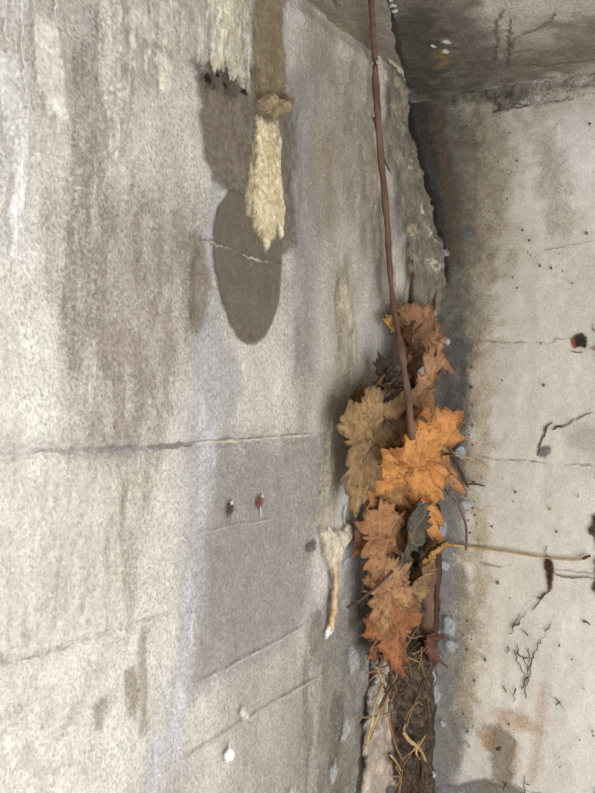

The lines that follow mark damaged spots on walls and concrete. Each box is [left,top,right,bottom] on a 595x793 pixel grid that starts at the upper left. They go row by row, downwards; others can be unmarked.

crack [493,9,557,69]
spalling [374,59,446,316]
crack [27,434,312,455]
leakage [0,0,369,793]
leakage [389,0,595,793]
crack [480,412,593,463]